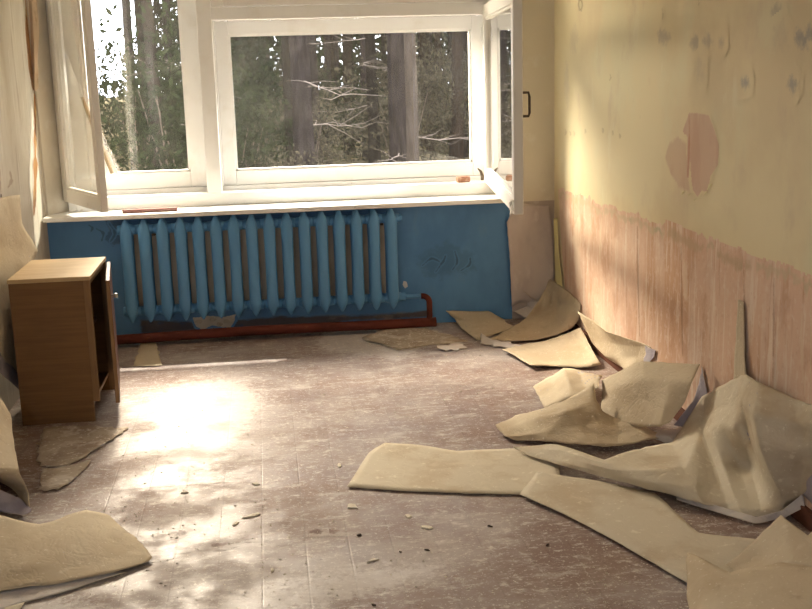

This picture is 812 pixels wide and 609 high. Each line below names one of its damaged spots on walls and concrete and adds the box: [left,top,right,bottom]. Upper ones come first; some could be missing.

peeling [662,111,720,200]